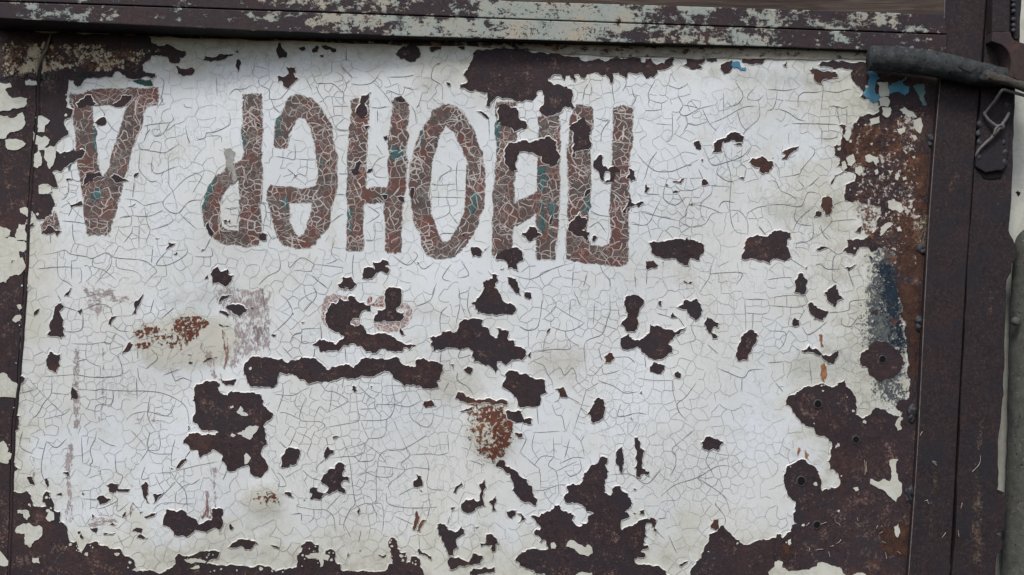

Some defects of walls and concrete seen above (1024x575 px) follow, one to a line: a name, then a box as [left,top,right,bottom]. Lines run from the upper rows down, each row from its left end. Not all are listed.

corrosion [844,122,879,159]
corrosion [133,316,209,350]
peeling [0,30,569,575]
crack [16,41,891,575]
corrosion [467,404,513,465]
peeling [412,46,937,575]
corrosion [896,153,929,379]